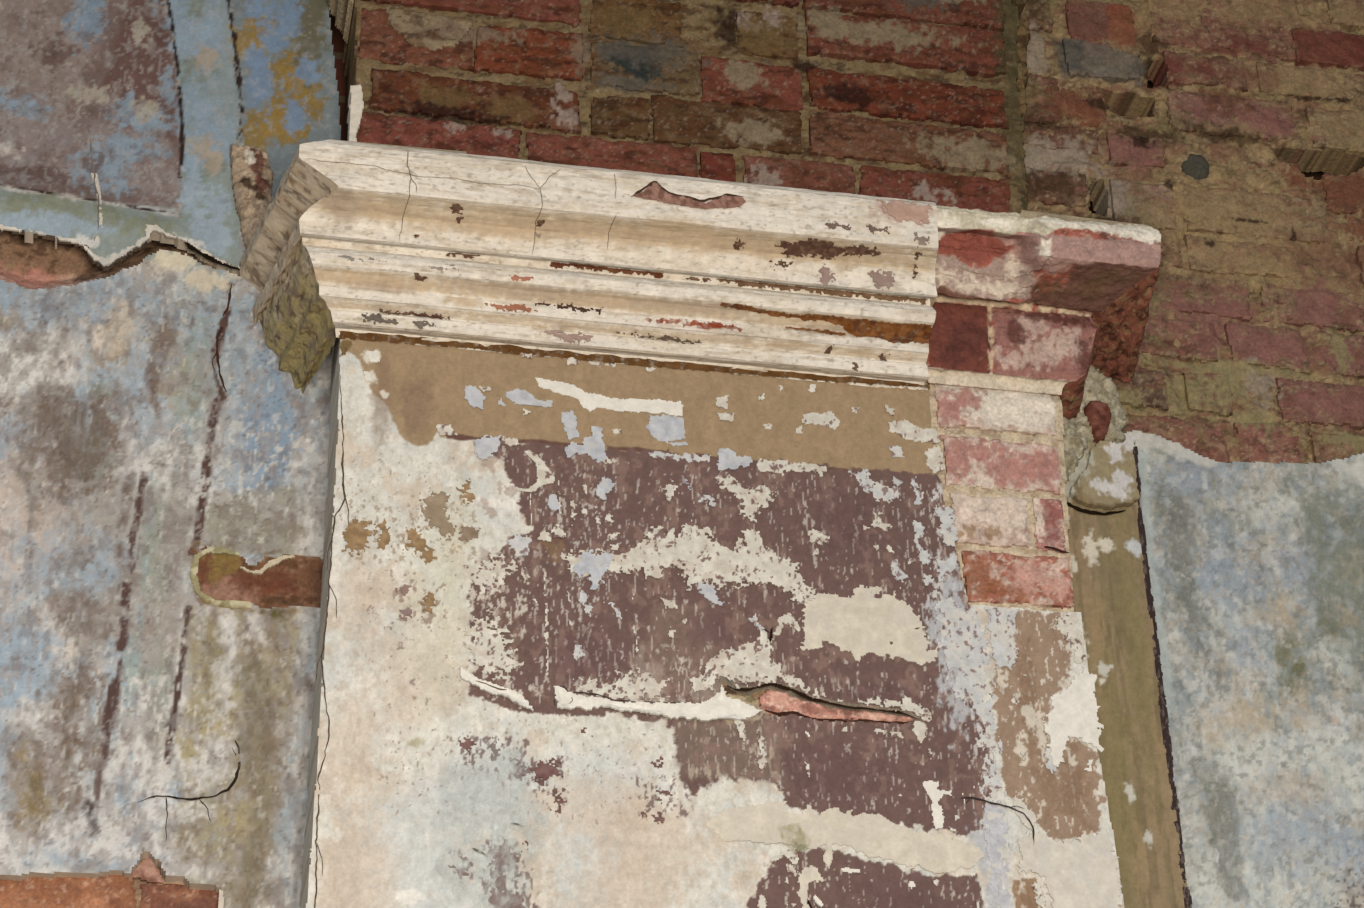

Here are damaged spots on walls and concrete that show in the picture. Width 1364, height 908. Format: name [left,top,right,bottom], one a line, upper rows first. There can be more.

flaking render [631,181,745,209]
peeling [414,252,480,282]
peeling [362,308,450,329]
peeling [364,350,380,383]
peeling [436,424,458,436]
peeling [342,478,481,565]
flaking render [448,199,1161,908]
flaking render [190,546,323,609]
peeling [395,584,436,621]
crack [137,740,241,839]
flaking render [0,857,224,908]